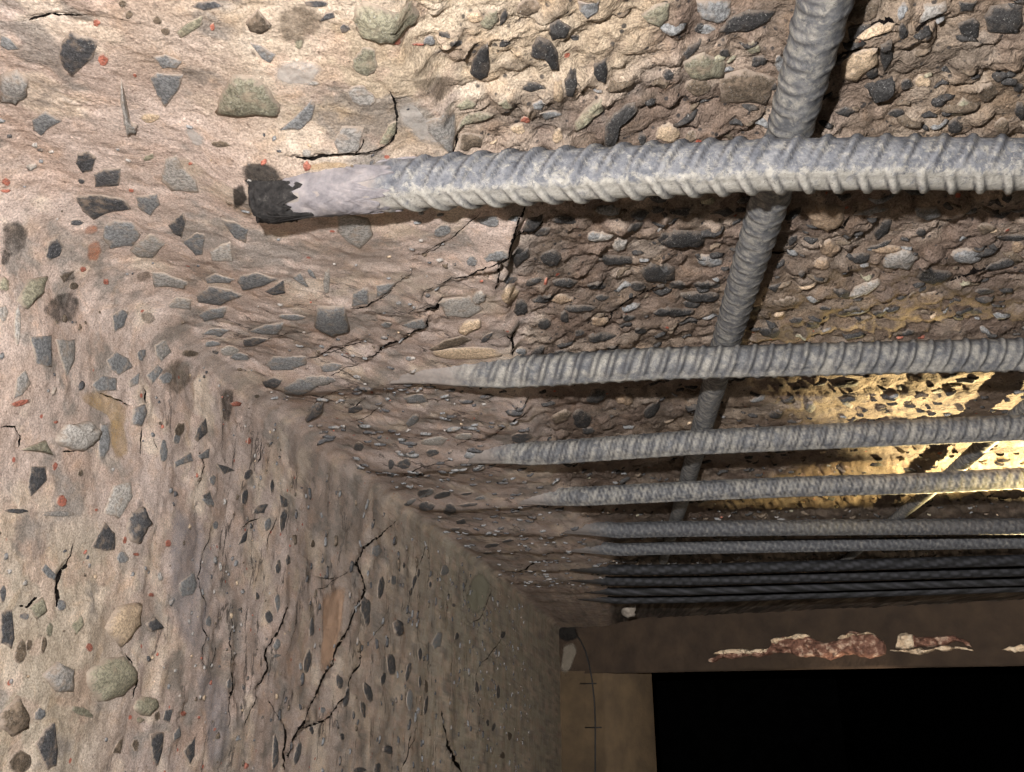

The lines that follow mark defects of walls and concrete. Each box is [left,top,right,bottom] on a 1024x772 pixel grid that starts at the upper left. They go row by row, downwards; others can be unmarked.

crack [295,92,399,161]
crack [309,206,544,422]
crack [19,544,73,608]
crack [197,521,396,770]
crack [441,711,461,771]